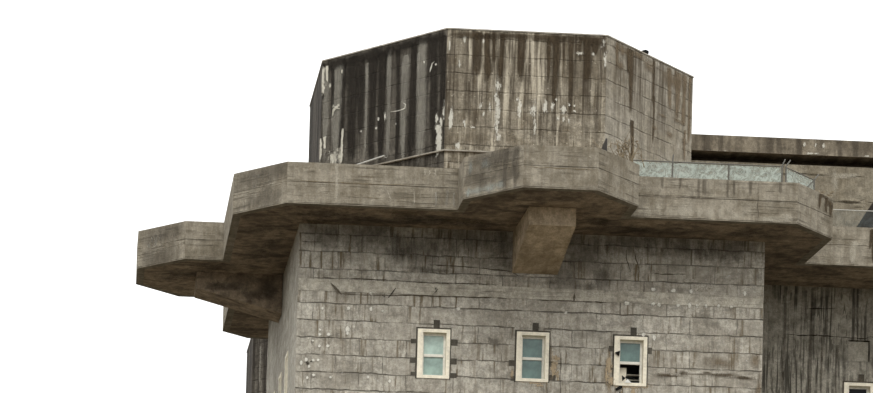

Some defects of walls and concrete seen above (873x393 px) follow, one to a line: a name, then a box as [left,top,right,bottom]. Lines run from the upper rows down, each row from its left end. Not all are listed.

peeling [319,129,344,164]
damp [322,32,603,159]